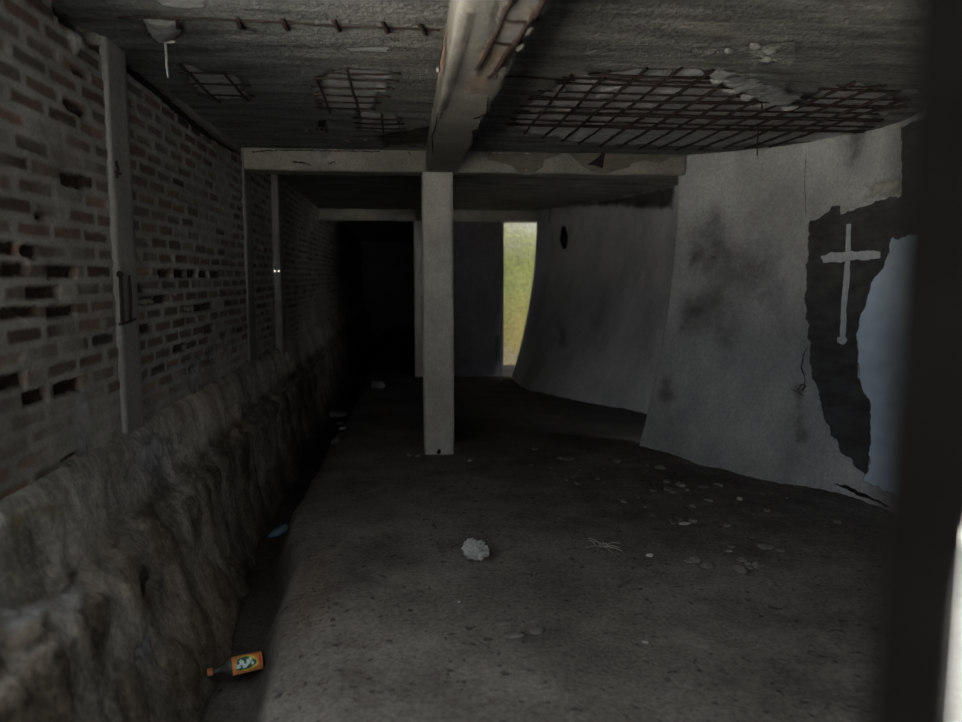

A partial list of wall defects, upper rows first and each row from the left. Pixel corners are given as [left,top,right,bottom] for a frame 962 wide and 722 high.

spalling [183,64,249,100]
spalling [317,69,429,147]
spalling [474,0,907,175]
crack [835,484,880,503]